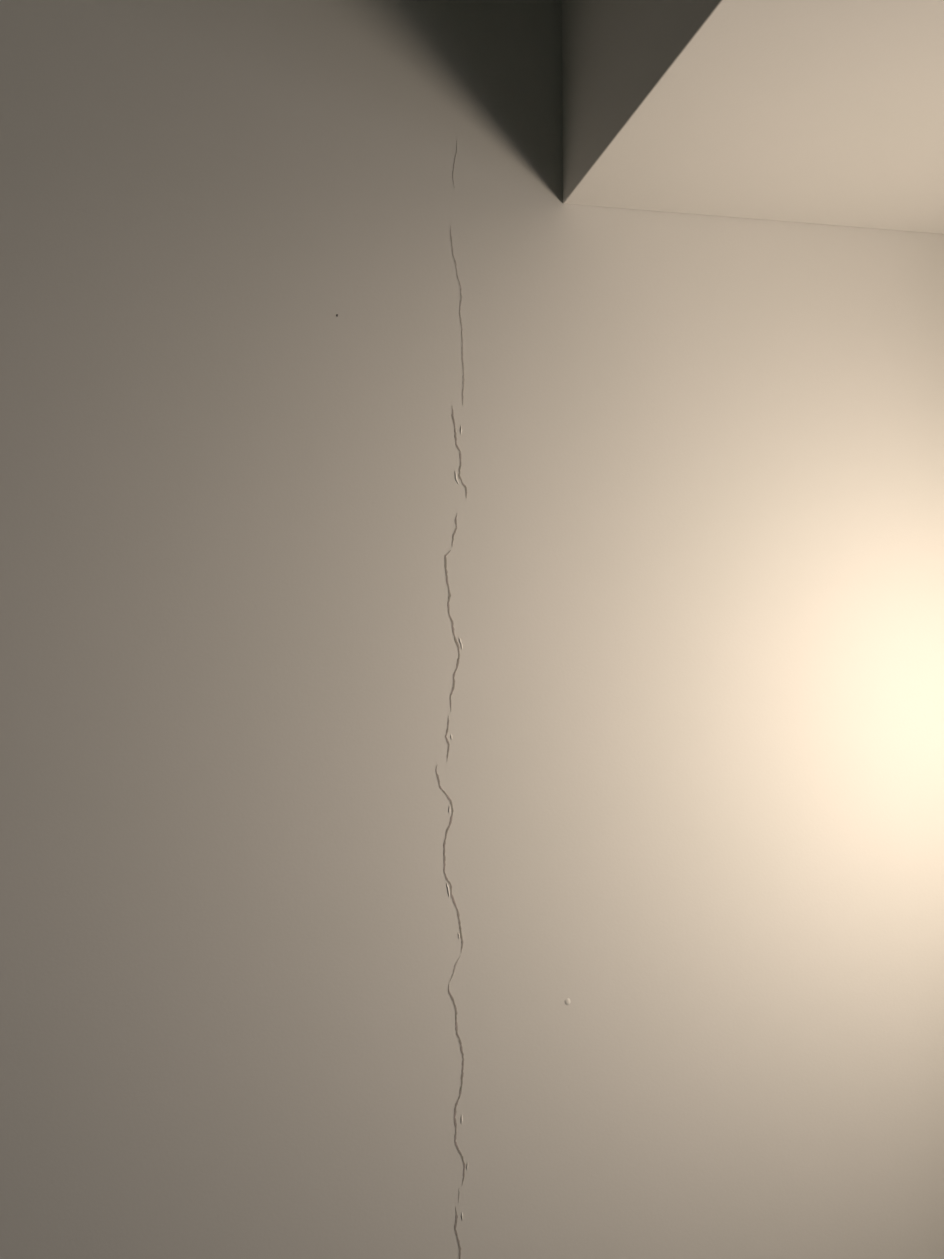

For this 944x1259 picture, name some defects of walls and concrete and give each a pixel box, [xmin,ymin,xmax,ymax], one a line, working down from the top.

crack [436,225,468,1259]